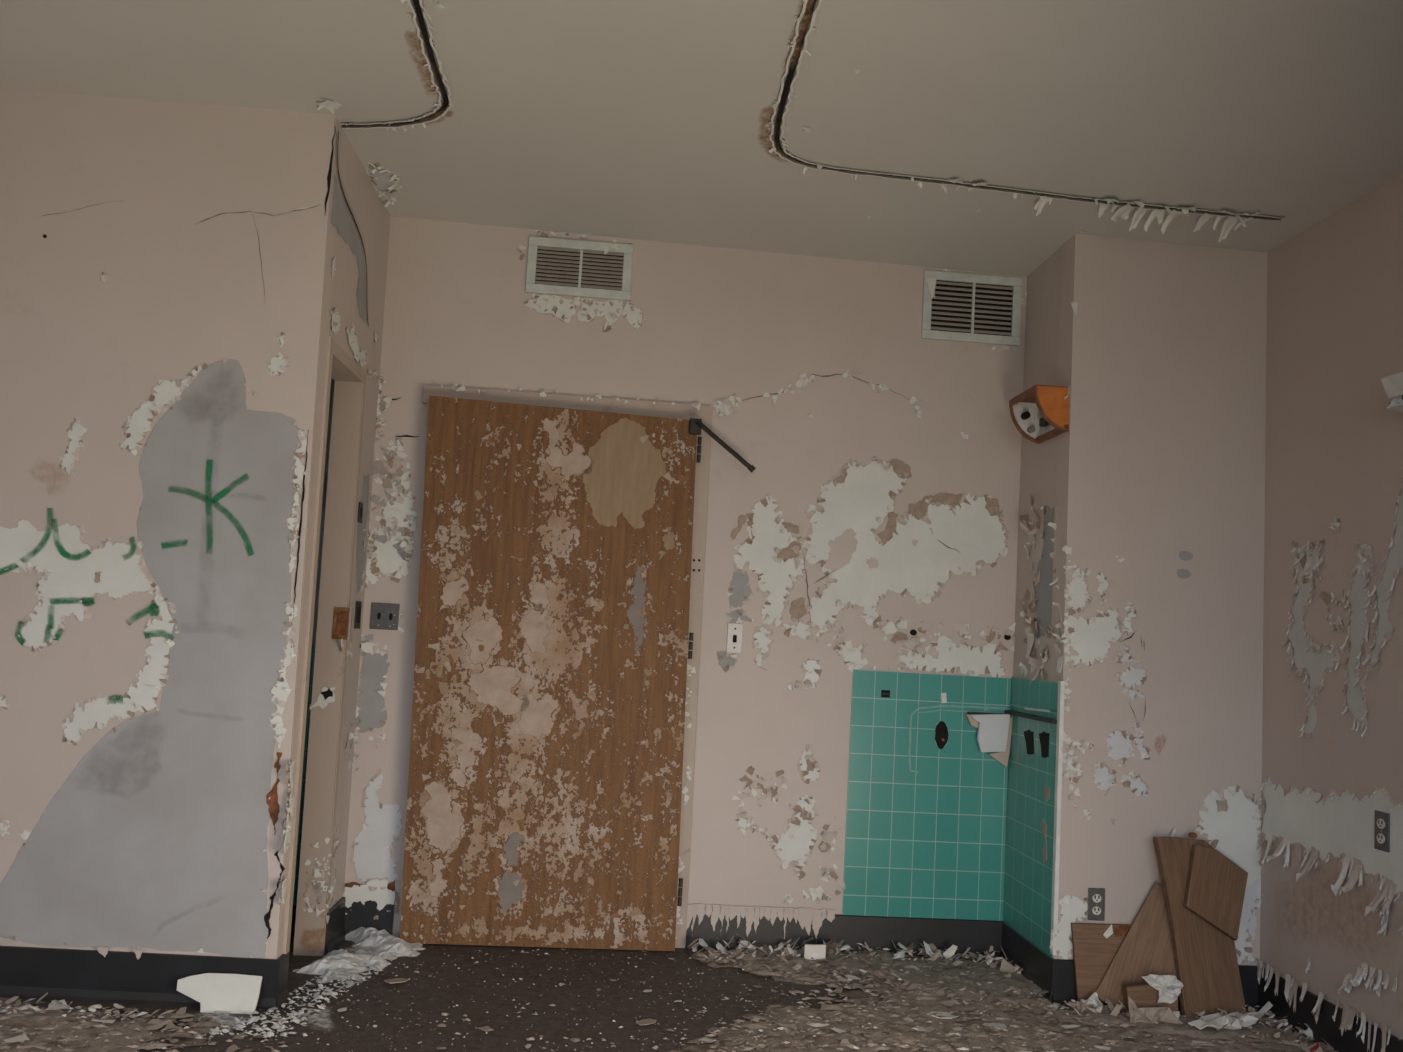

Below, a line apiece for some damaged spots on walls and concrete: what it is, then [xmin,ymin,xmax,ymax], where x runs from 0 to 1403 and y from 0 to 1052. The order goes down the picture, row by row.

peeling [0,357,308,959]